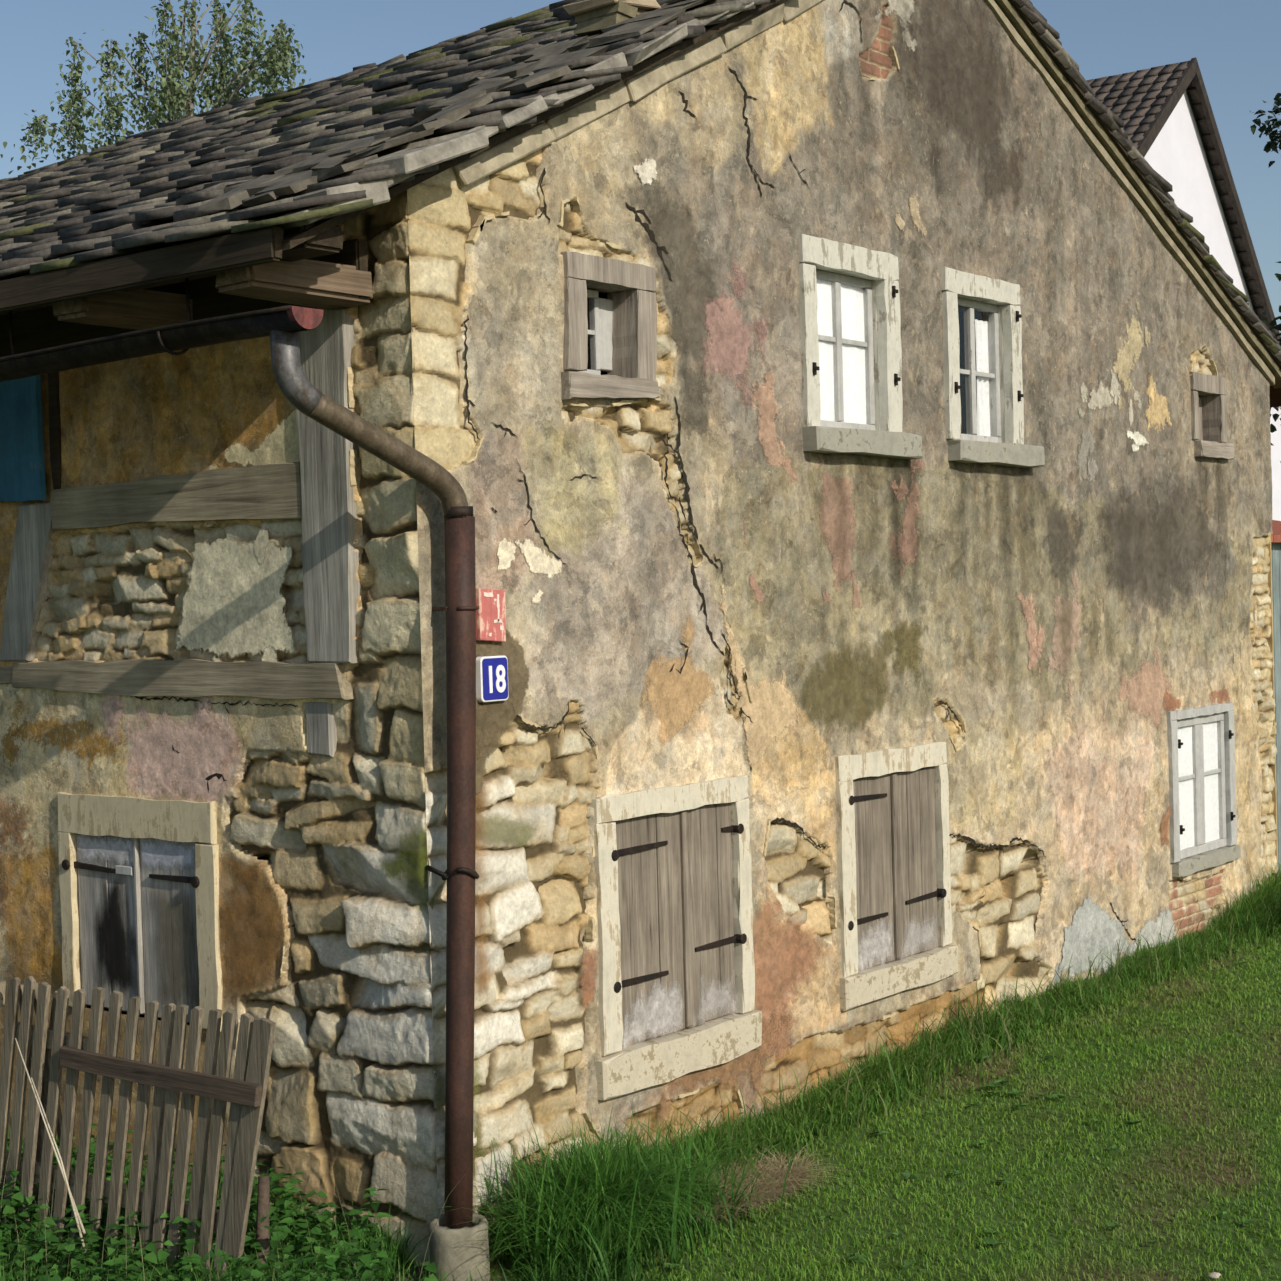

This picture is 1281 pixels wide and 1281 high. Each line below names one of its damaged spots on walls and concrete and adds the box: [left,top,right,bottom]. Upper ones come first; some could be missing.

crack [538,168,550,223]
crack [626,202,673,282]
crack [728,66,809,197]
crack [463,314,568,567]
flaking render [497,538,562,605]
spalling [561,281,704,568]
crack [658,397,753,723]
water stain [896,621,922,672]
flaking render [1078,302,1172,481]
spalling [0,446,447,1268]
spalling [473,701,602,1249]
spalling [623,819,1054,1156]